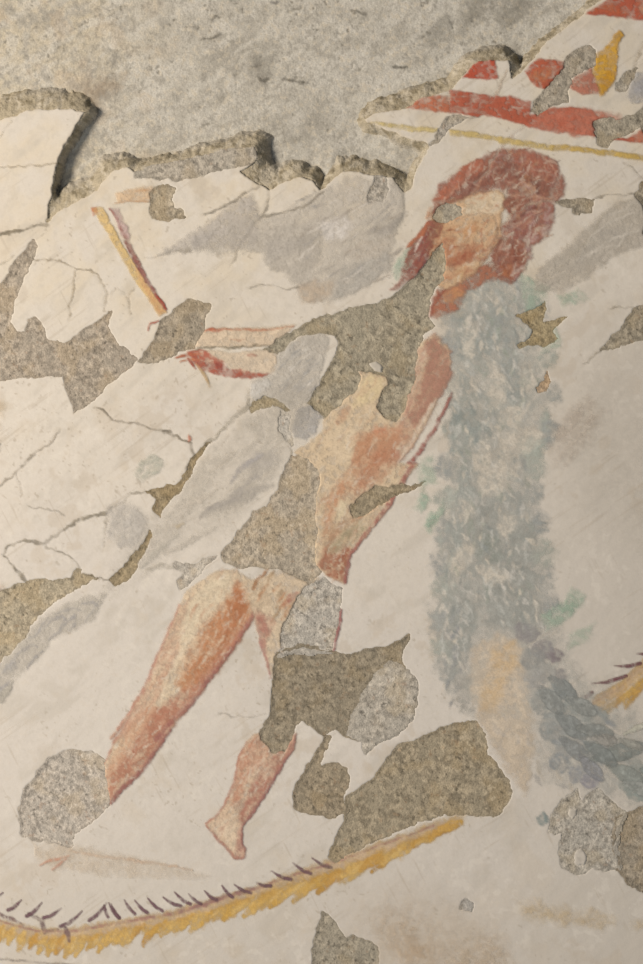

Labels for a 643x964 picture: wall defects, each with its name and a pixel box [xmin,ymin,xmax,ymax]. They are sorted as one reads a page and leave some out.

spalling [0,0,601,223]
spalling [593,107,643,148]
spalling [0,239,212,414]
spalling [263,243,446,422]
spalling [600,305,643,352]
crack [162,427,224,470]
crack [66,512,106,528]
spalling [0,530,152,663]
spalling [172,396,513,863]
spalling [18,749,110,848]
spalling [548,788,643,893]
spalling [311,911,380,964]